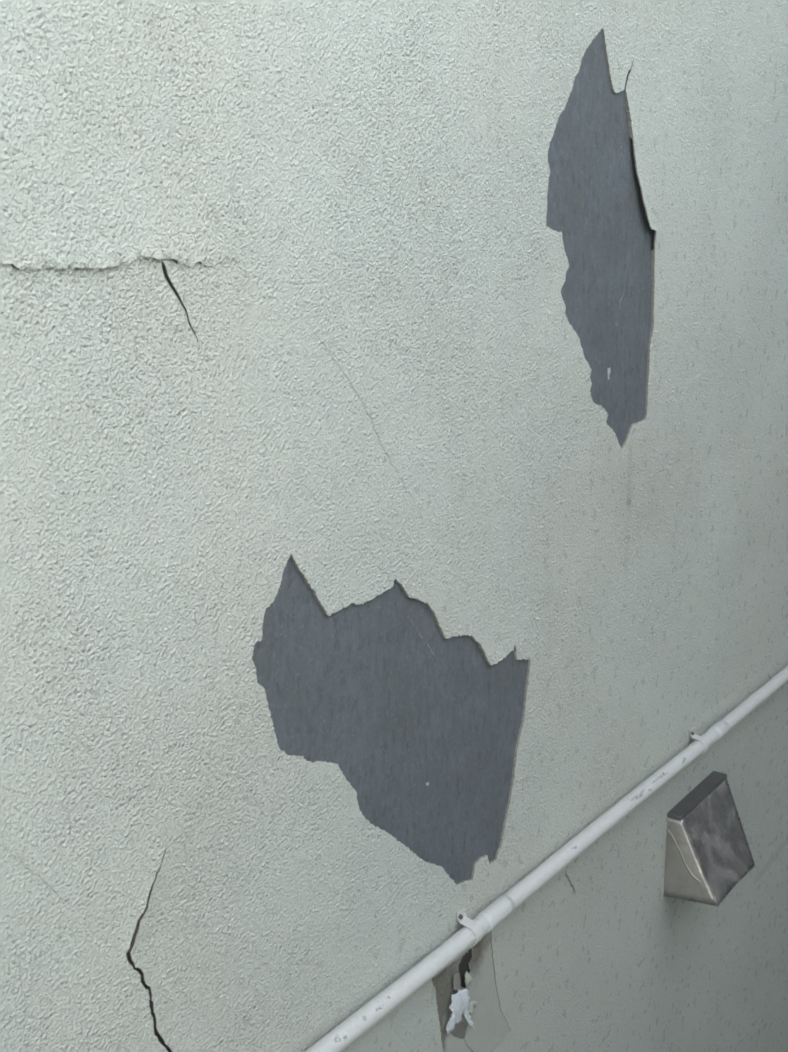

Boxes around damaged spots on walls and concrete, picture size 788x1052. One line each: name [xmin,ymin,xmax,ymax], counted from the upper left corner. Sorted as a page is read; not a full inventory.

crack [141,256,230,343]
peeling [546,29,657,448]
peeling [252,554,530,885]
crack [126,850,172,1052]
spalling [431,931,511,1052]